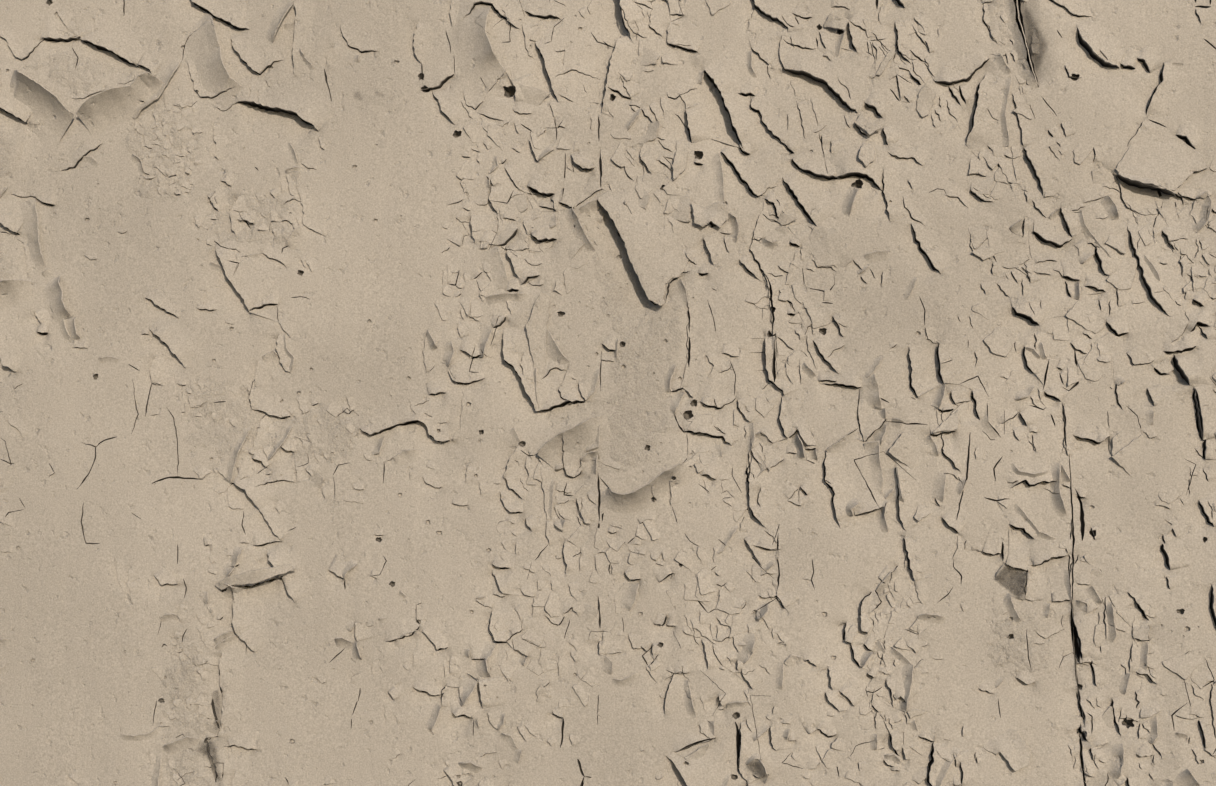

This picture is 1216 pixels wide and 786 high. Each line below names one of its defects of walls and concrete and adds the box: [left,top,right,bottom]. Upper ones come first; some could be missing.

spalling [403,0,1216,786]
crack [1108,427,1155,464]
crack [1155,366,1216,543]
peeling [329,614,448,670]
crack [979,454,1127,786]